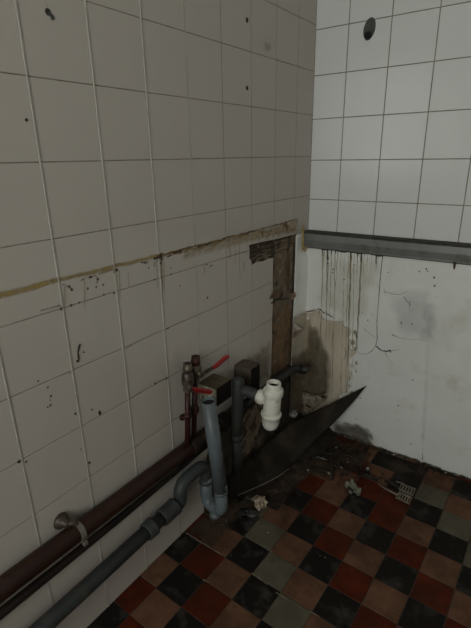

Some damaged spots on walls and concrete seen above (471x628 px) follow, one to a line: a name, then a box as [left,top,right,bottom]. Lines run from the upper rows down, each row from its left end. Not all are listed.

spalling [242,234,358,464]
crack [357,259,411,364]
spalling [220,426,233,487]
damp [334,419,371,443]